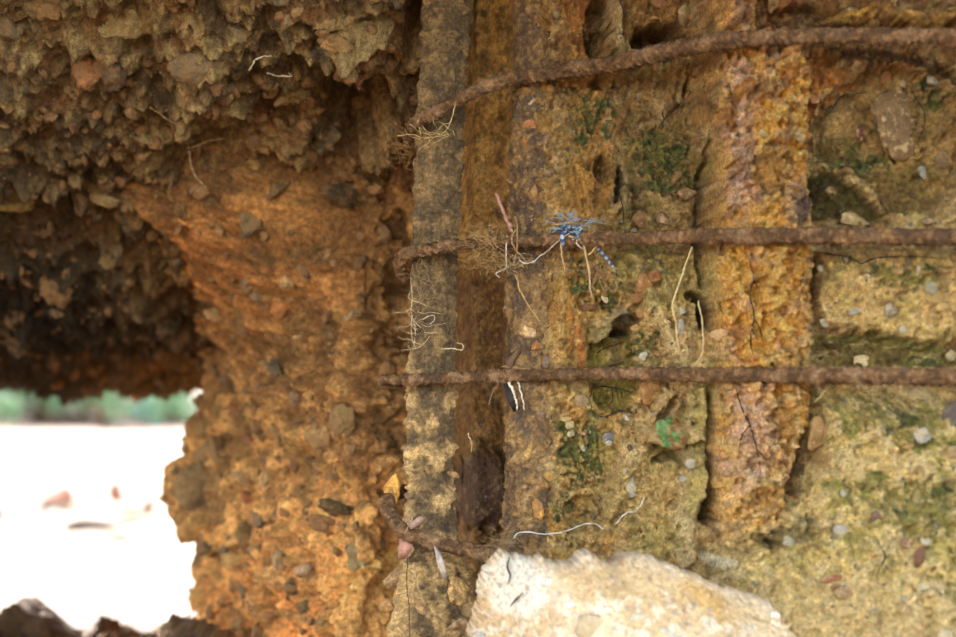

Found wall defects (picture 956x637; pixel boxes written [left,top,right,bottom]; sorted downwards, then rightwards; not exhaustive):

spalling [624,13,706,50]
corrosion [559,151,615,227]
corrosion [797,43,862,150]
spalling [809,60,956,218]
corrosion [546,248,591,369]
spalling [686,293,713,330]
spalling [809,245,956,346]
peeling [586,308,639,427]
corrosion [704,383,728,481]
crack [736,389,766,474]
spalling [775,405,836,528]
corrosion [544,500,571,543]